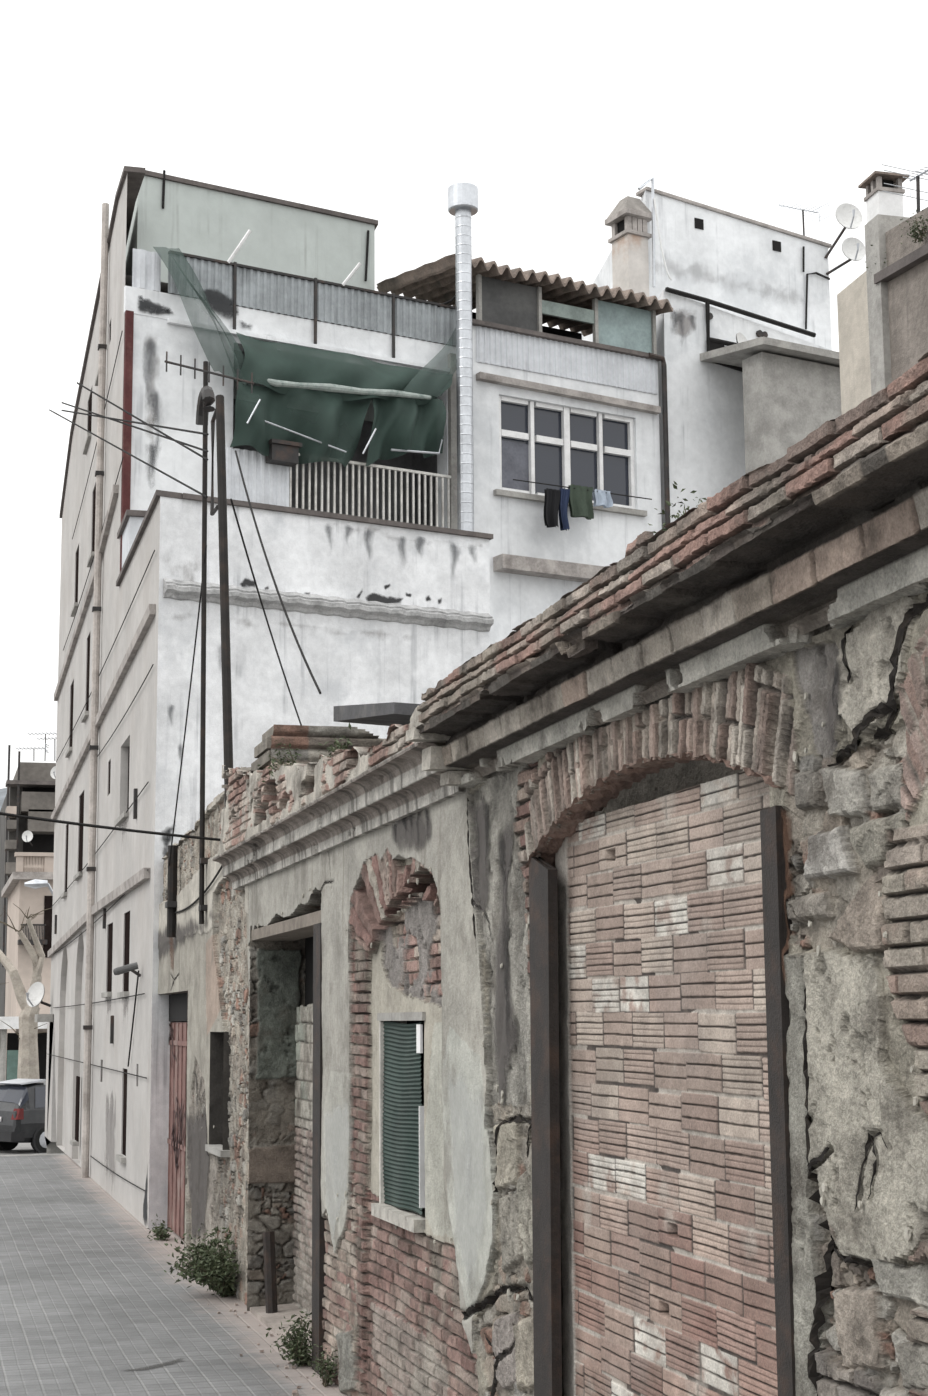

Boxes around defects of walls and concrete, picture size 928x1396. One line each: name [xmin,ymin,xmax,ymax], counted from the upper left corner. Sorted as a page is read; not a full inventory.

water stain [147,342,158,423]
spalling [185,877,322,1305]
peeling [357,584,442,604]
spalling [322,762,538,1396]
spalling [783,640,928,1115]
crack [826,594,928,768]